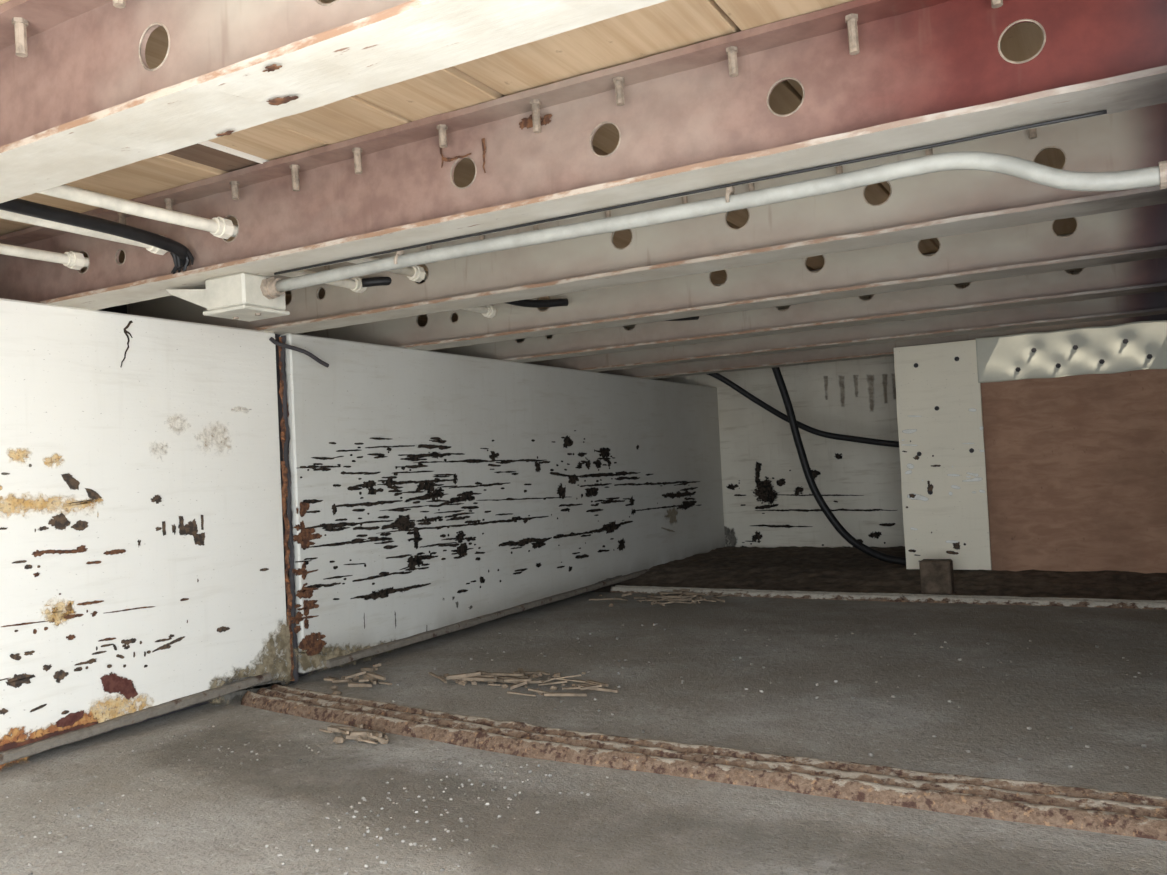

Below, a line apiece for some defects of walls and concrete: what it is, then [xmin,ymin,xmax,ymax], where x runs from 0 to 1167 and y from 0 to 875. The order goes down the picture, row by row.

peeling [35,473,102,532]
rust [278,337,294,681]
peeling [577,447,653,552]
peeling [726,461,821,514]
peeling [843,523,895,547]
peeling [289,502,327,656]
peeling [1,593,155,640]
peeling [6,638,116,686]
peeling [100,672,138,700]
peeling [56,710,84,728]
rust [0,695,148,770]